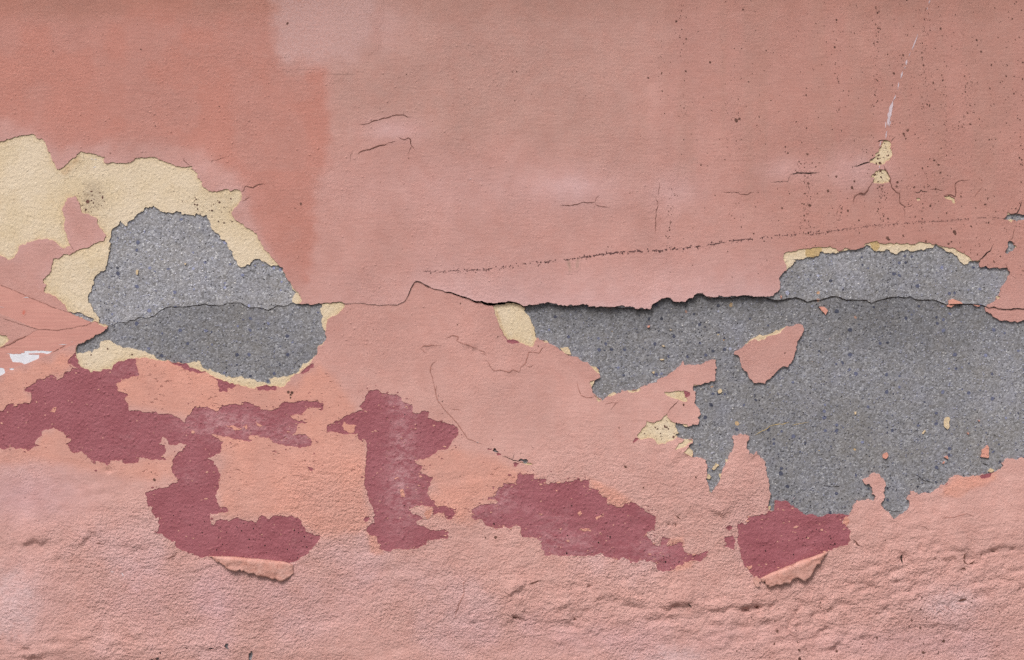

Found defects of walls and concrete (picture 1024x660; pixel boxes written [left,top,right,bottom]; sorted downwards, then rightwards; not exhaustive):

crack [350,113,415,157]
crack [853,138,980,206]
spalling [0,134,345,582]
crack [421,335,546,443]
crack [0,281,1022,352]
spalling [493,240,1024,588]
peeling [327,385,709,572]